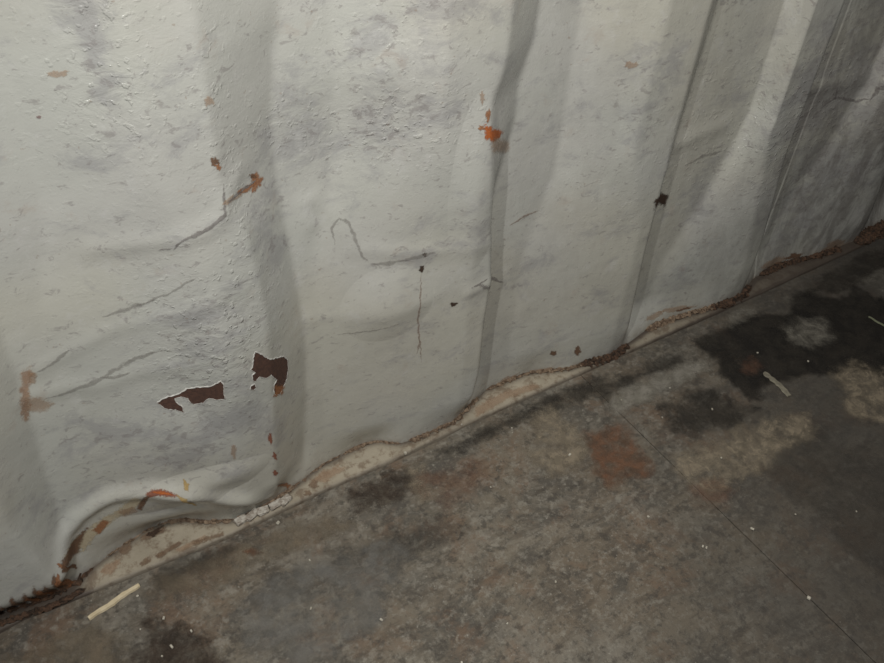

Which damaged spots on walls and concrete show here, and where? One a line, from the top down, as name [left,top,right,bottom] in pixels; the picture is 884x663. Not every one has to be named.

rust [478,110,502,141]
rust [653,193,669,207]
crack [472,277,503,289]
rust [759,245,843,276]
rust [645,285,752,332]
peeling [156,380,226,413]
peeling [250,351,289,397]
rust [486,343,630,390]
water stain [662,390,744,432]
rust [260,397,479,507]
rust [0,479,196,627]
rust [105,512,249,559]